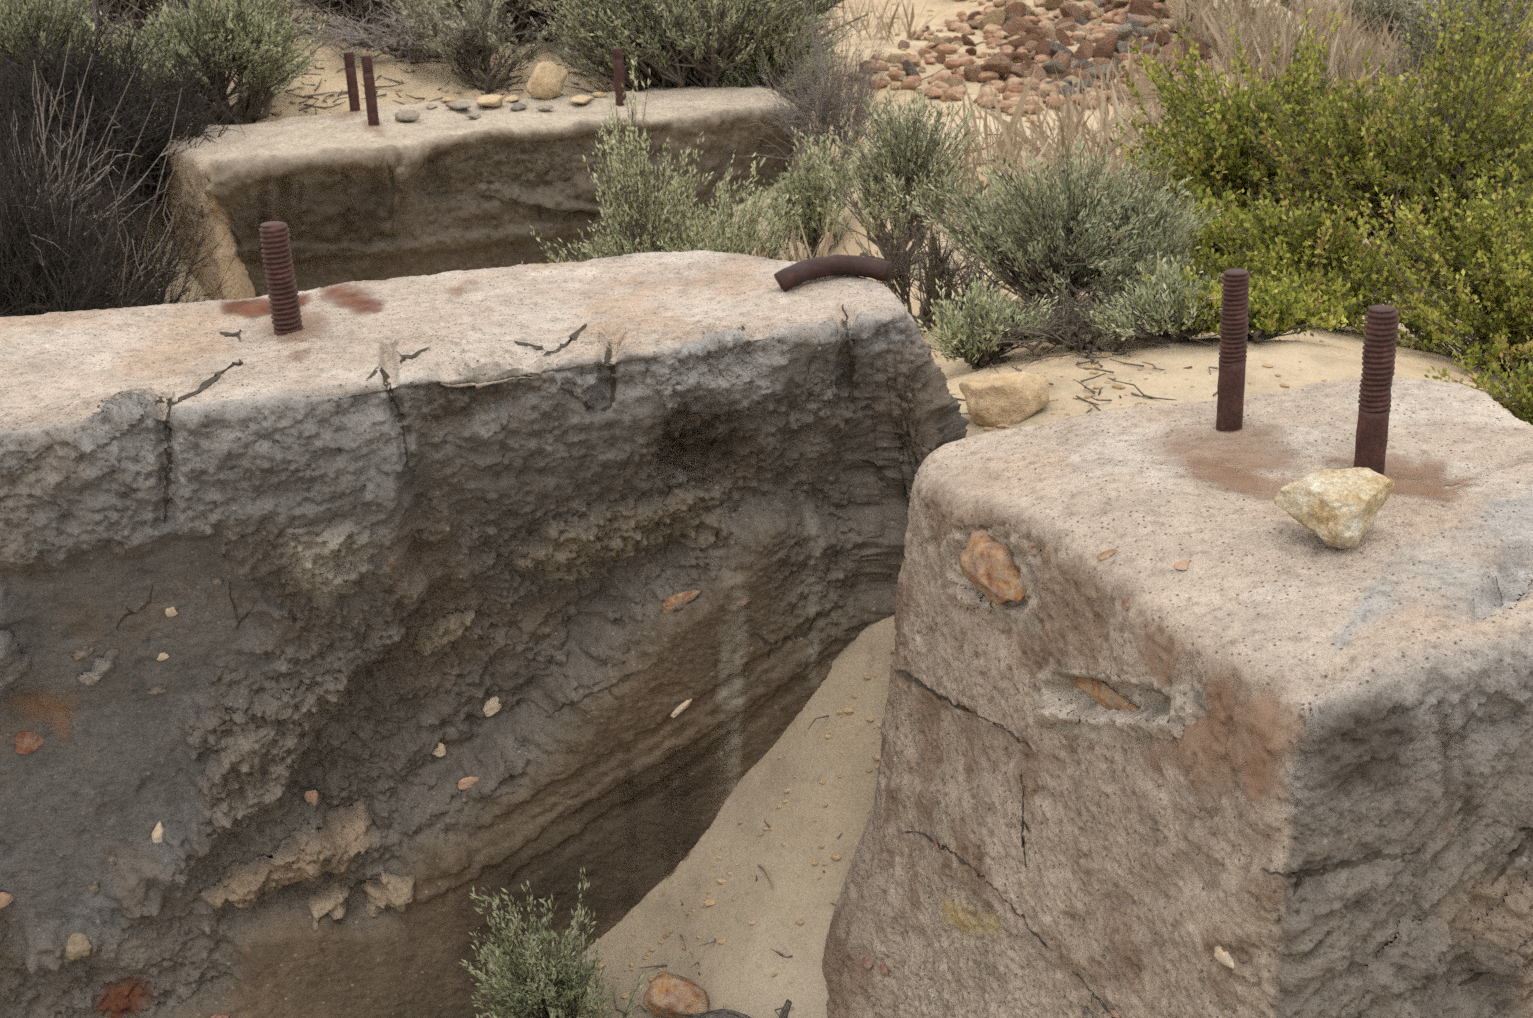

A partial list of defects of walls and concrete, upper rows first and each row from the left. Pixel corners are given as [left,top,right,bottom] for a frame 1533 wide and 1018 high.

rust [223,299,273,327]
rust [327,287,381,311]
crack [367,347,429,465]
spalling [1022,662,1217,740]
crack [890,664,1115,1018]